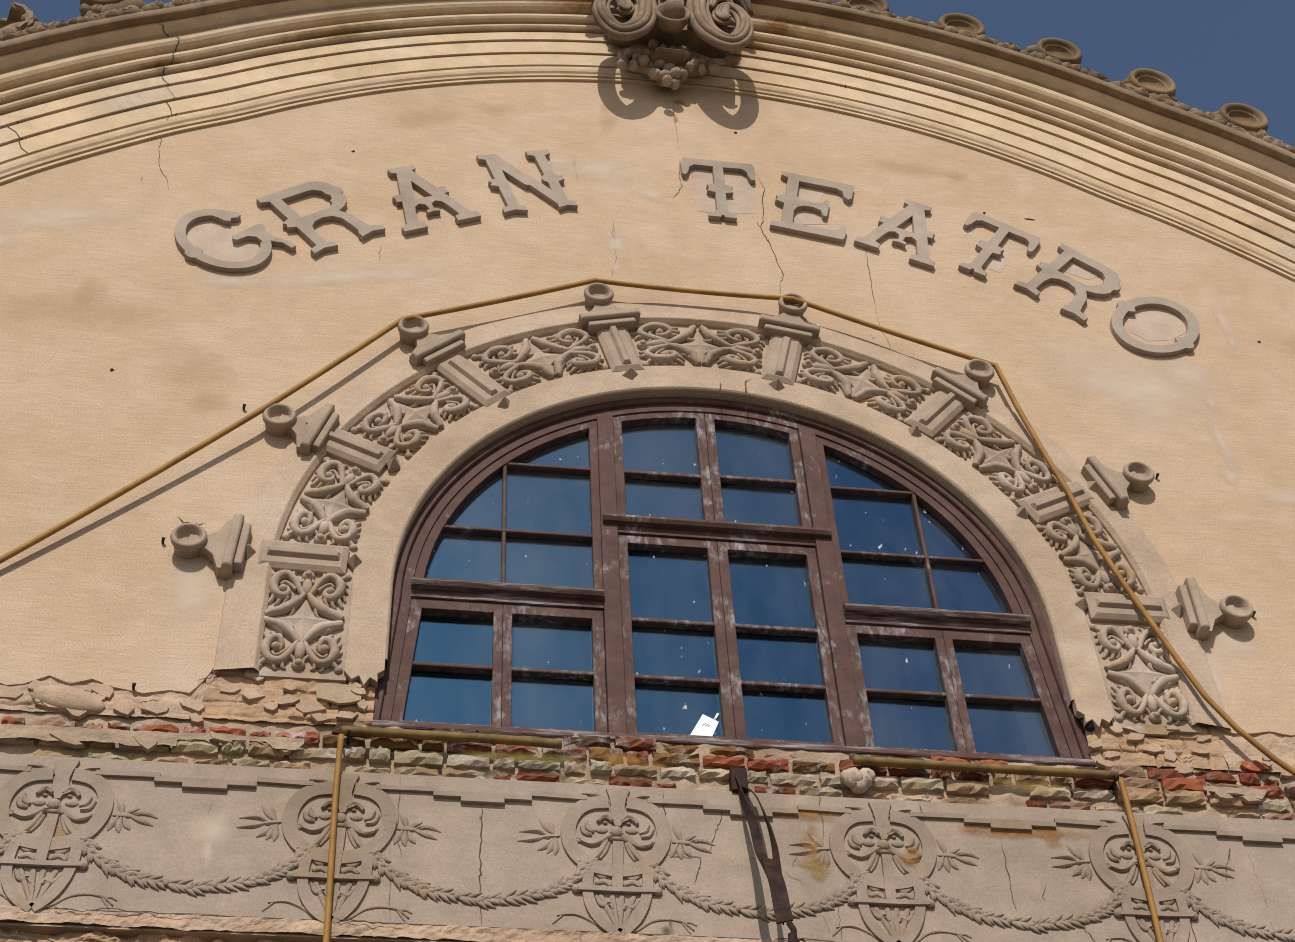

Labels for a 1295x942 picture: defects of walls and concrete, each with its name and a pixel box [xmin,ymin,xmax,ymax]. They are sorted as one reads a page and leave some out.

crack [141,24,180,188]
crack [757,178,784,293]
flaking render [133,735,157,753]
flaking render [0,668,376,748]
flaking render [1083,723,1295,779]
crack [477,804,485,924]
crack [1002,844,1046,908]